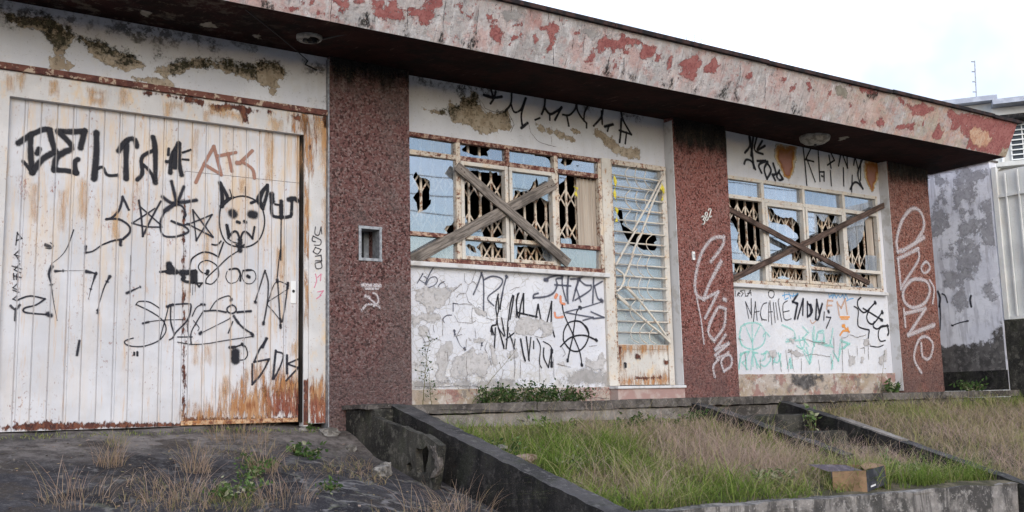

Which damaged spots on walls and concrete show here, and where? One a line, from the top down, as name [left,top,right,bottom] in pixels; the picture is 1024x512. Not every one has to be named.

peeling [285,0,560,54]
flaking render [4,13,286,96]
peeling [584,33,721,82]
rust [143,91,279,133]
flaking render [424,91,512,135]
flaking render [594,128,640,160]
peeling [861,97,1017,156]
rust [292,113,326,259]
rust [2,199,325,431]
crack [415,271,609,422]
rust [618,345,670,385]
leakage [941,323,1006,372]